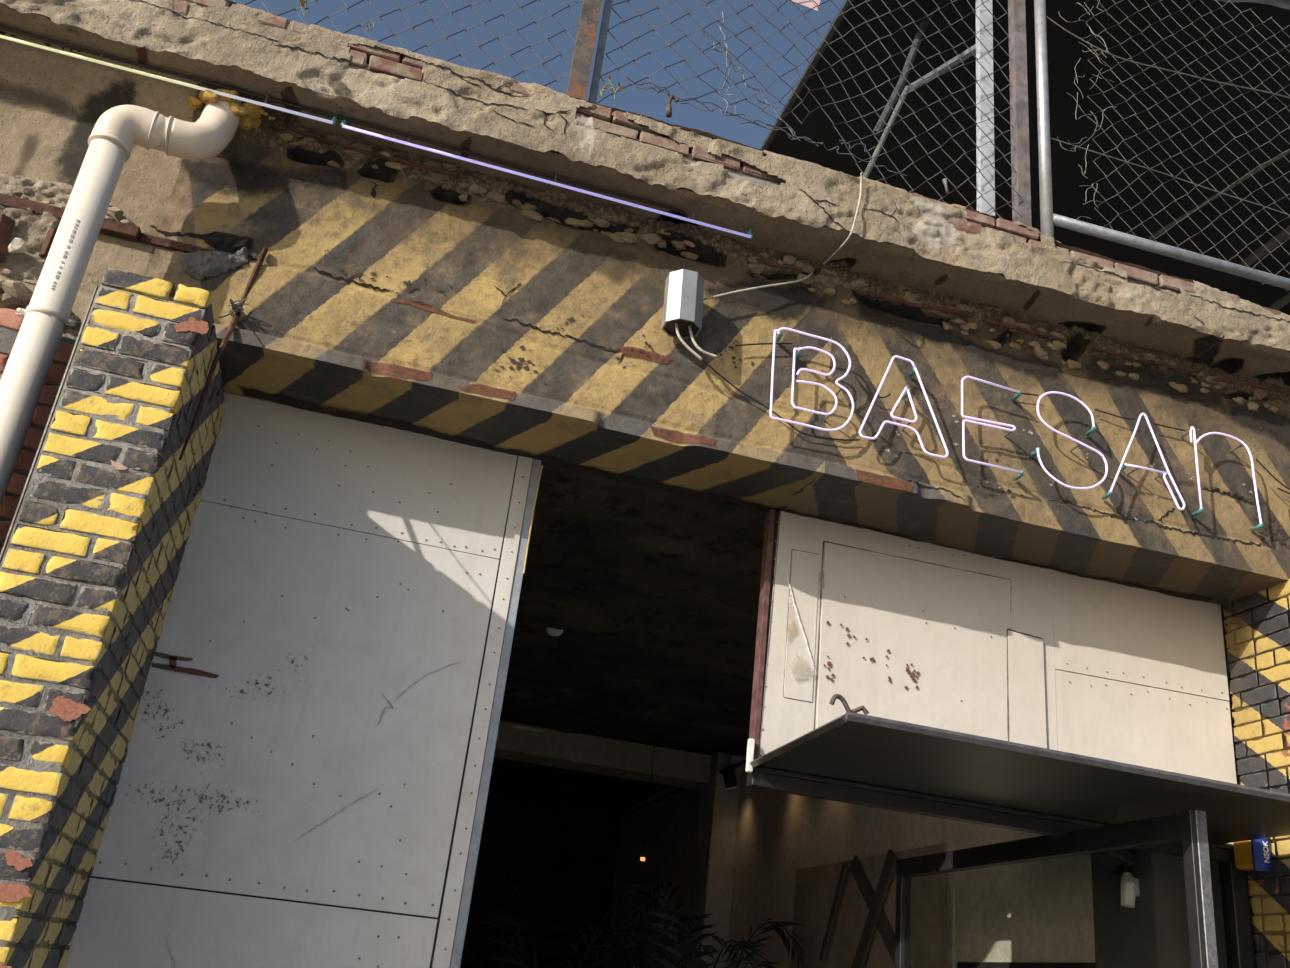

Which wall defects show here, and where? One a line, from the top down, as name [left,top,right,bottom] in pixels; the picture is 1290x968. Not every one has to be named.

crack [422,60,570,134]
spalling [0,173,73,284]
crack [150,225,264,279]
crack [312,267,393,291]
spalling [280,127,727,267]
crack [799,188,899,230]
spalling [747,253,1290,413]
crack [1051,499,1272,547]
crack [1201,487,1254,505]
rust [151,652,220,678]